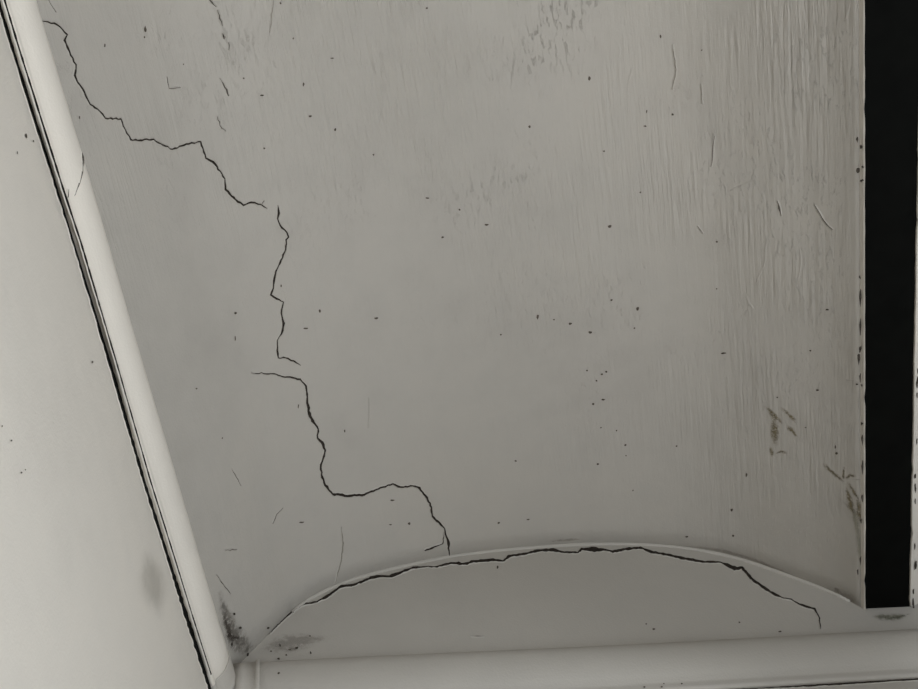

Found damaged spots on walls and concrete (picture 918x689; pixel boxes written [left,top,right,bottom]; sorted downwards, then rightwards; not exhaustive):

crack [42,0,822,635]